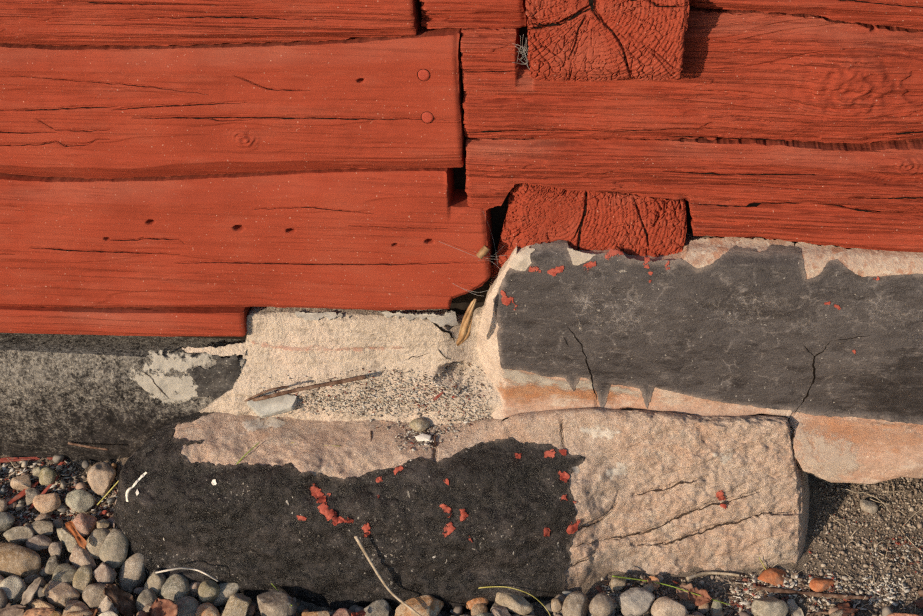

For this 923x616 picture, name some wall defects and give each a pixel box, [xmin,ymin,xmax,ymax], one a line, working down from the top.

crack [528,0,630,77]
crack [573,192,587,250]
peeling [510,246,535,271]
peeling [567,248,596,265]
peeling [684,237,923,279]
peeling [295,310,350,321]
peeling [379,310,460,327]
peeling [130,342,247,404]
crack [563,327,598,406]
crack [790,335,870,440]